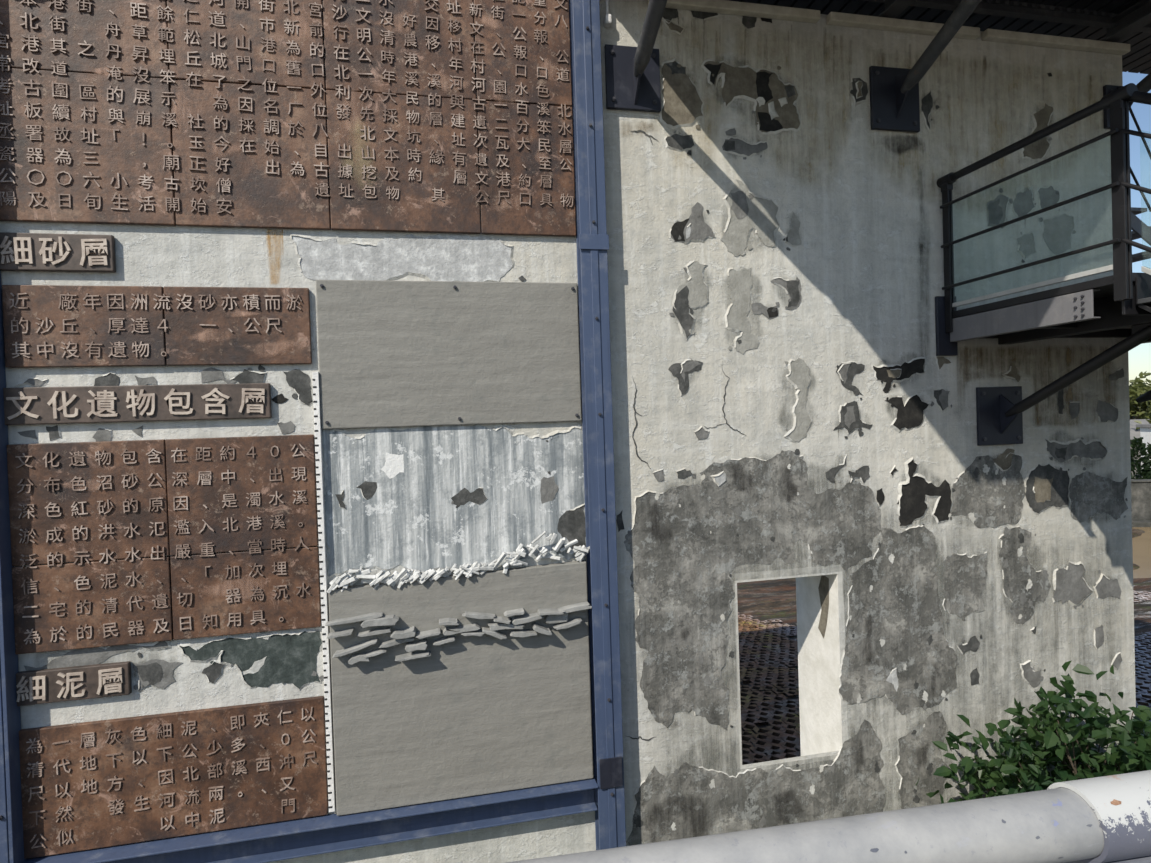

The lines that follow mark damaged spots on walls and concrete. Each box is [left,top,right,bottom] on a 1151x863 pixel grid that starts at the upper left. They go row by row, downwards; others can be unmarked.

peeling [659,58,802,160]
peeling [669,179,802,354]
peeling [616,356,1128,846]